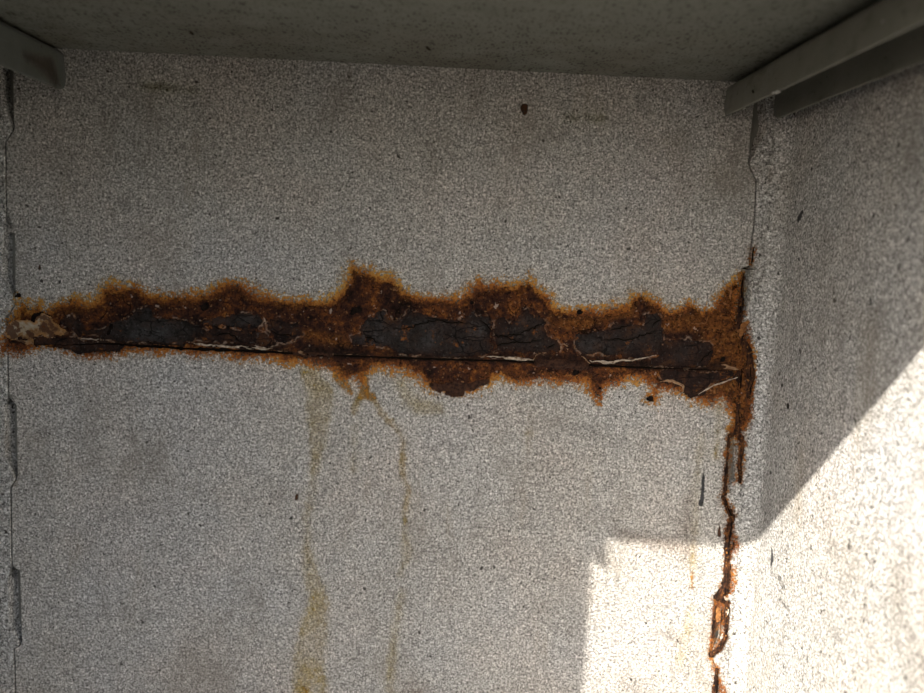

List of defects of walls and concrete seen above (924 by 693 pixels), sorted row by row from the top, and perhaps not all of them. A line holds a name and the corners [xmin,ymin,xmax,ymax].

corrosion [0,247,758,693]